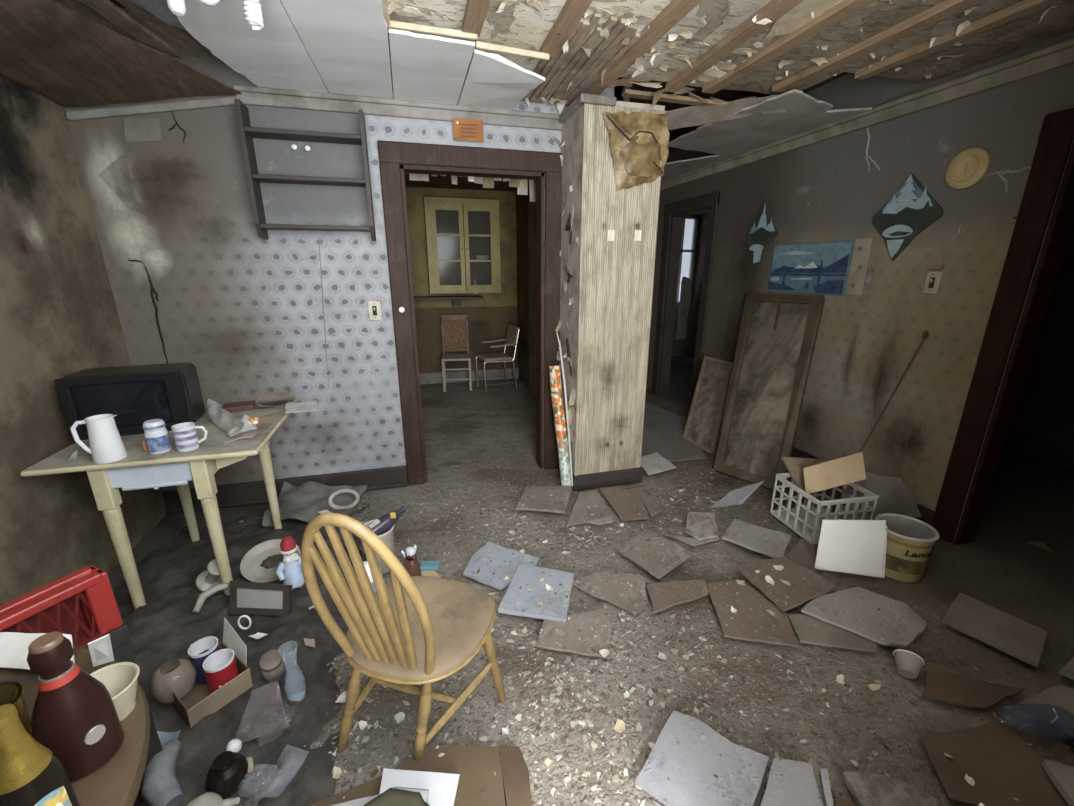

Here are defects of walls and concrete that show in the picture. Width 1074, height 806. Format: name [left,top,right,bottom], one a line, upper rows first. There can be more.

peeling [388,1,436,15]
peeling [496,0,550,14]
flaking render [522,0,844,114]
peeling [924,7,978,79]
water stain [0,75,40,201]